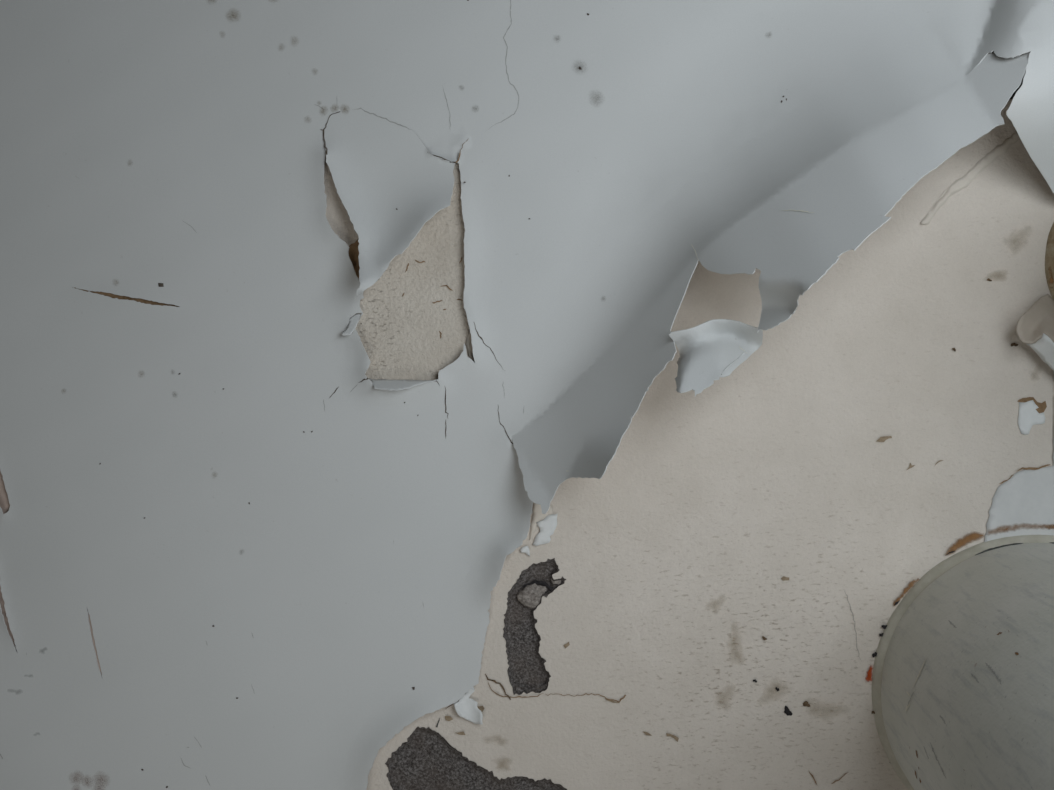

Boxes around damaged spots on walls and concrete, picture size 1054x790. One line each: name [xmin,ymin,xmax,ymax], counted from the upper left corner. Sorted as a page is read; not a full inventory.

crack [75,288,179,307]
flaking render [324,156,475,391]
flaking render [366,99,1054,790]
crack [0,471,10,514]
crack [0,586,17,651]